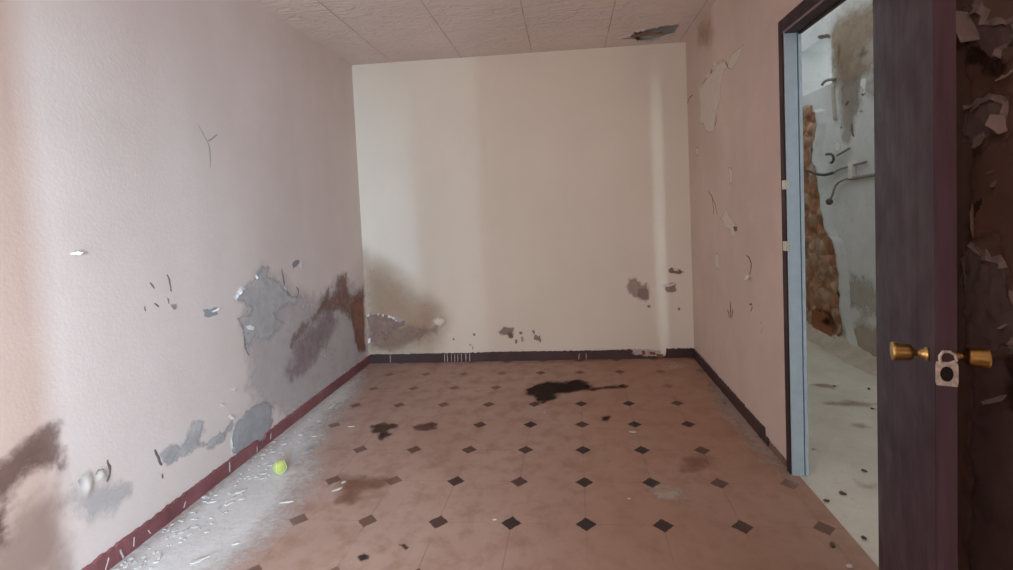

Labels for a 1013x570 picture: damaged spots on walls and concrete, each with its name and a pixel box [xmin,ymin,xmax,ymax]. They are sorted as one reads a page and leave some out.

peeling [956,0,1013,81]
crack [198,125,217,168]
peeling [961,93,1008,148]
peeling [234,260,302,356]
leakage [290,269,433,380]
peeling [960,198,1013,355]
peeling [113,402,321,570]